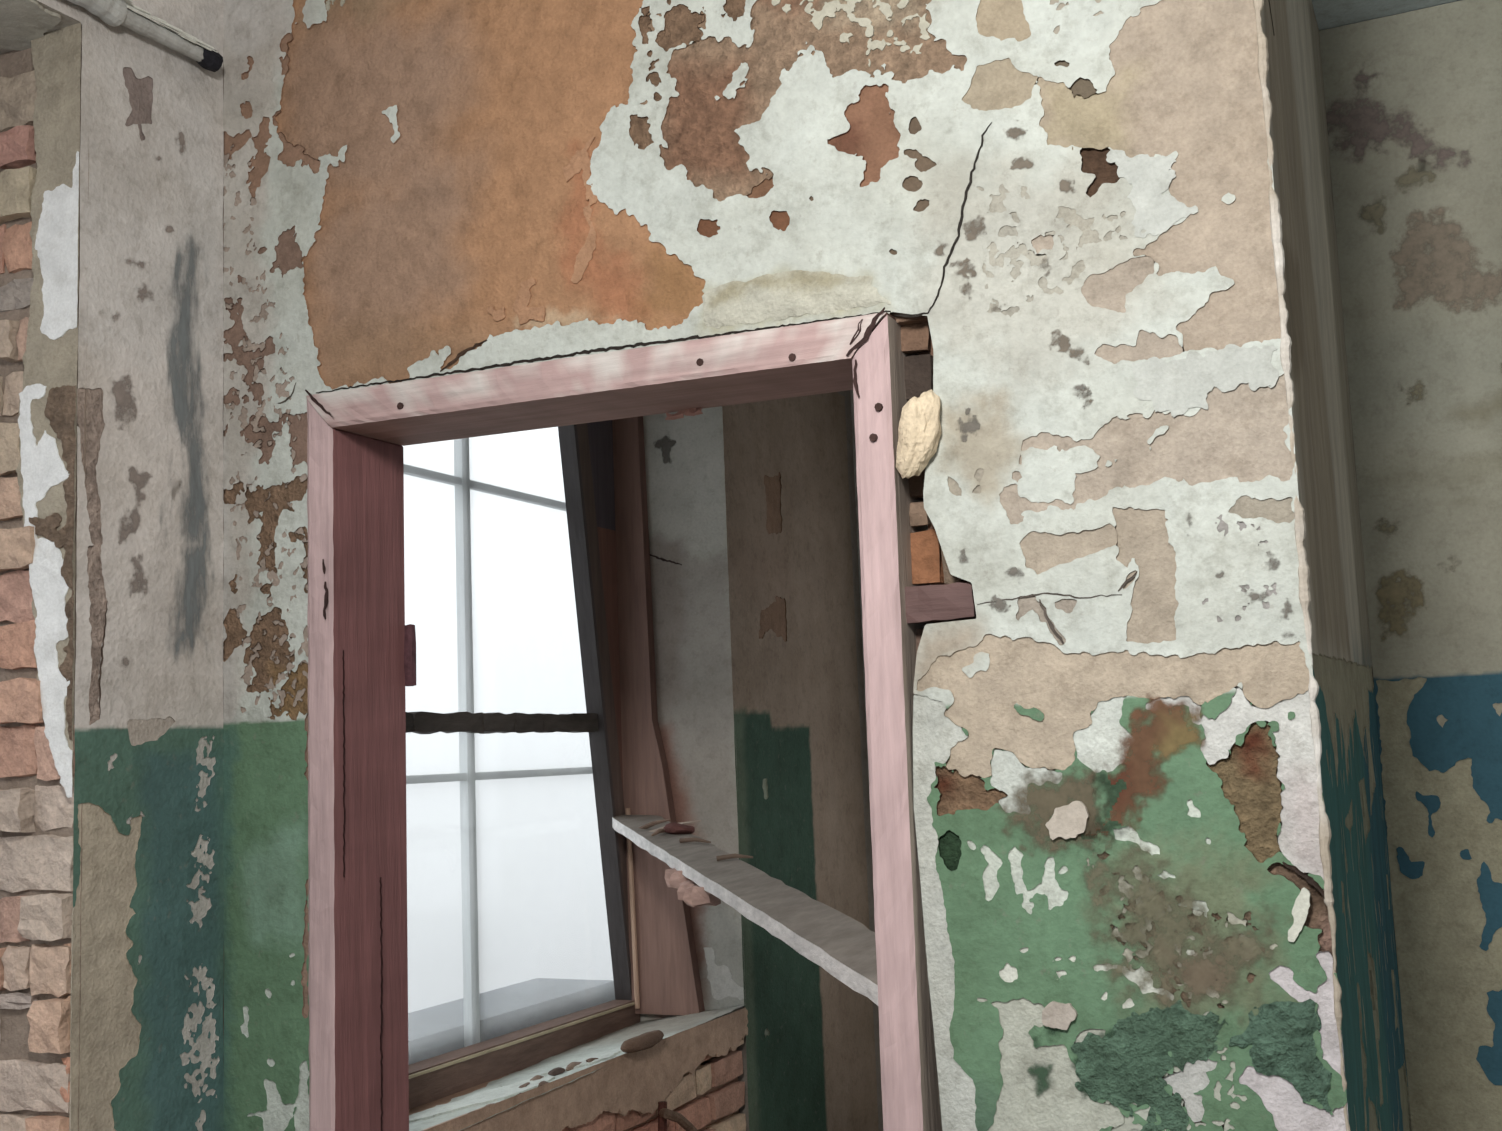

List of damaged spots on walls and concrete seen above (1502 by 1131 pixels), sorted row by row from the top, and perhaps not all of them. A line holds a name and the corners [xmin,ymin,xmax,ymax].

crack [278,122,992,404]
peeling [0,70,145,1131]
water stain [113,375,137,421]
water stain [119,467,151,543]
water stain [130,555,148,593]
water stain [168,241,209,654]
spalling [223,0,1298,781]
crack [977,572,1137,644]
rust [1003,697,1282,863]
peeling [186,834,215,928]
peeling [180,963,220,1131]
peeling [247,1058,310,1131]